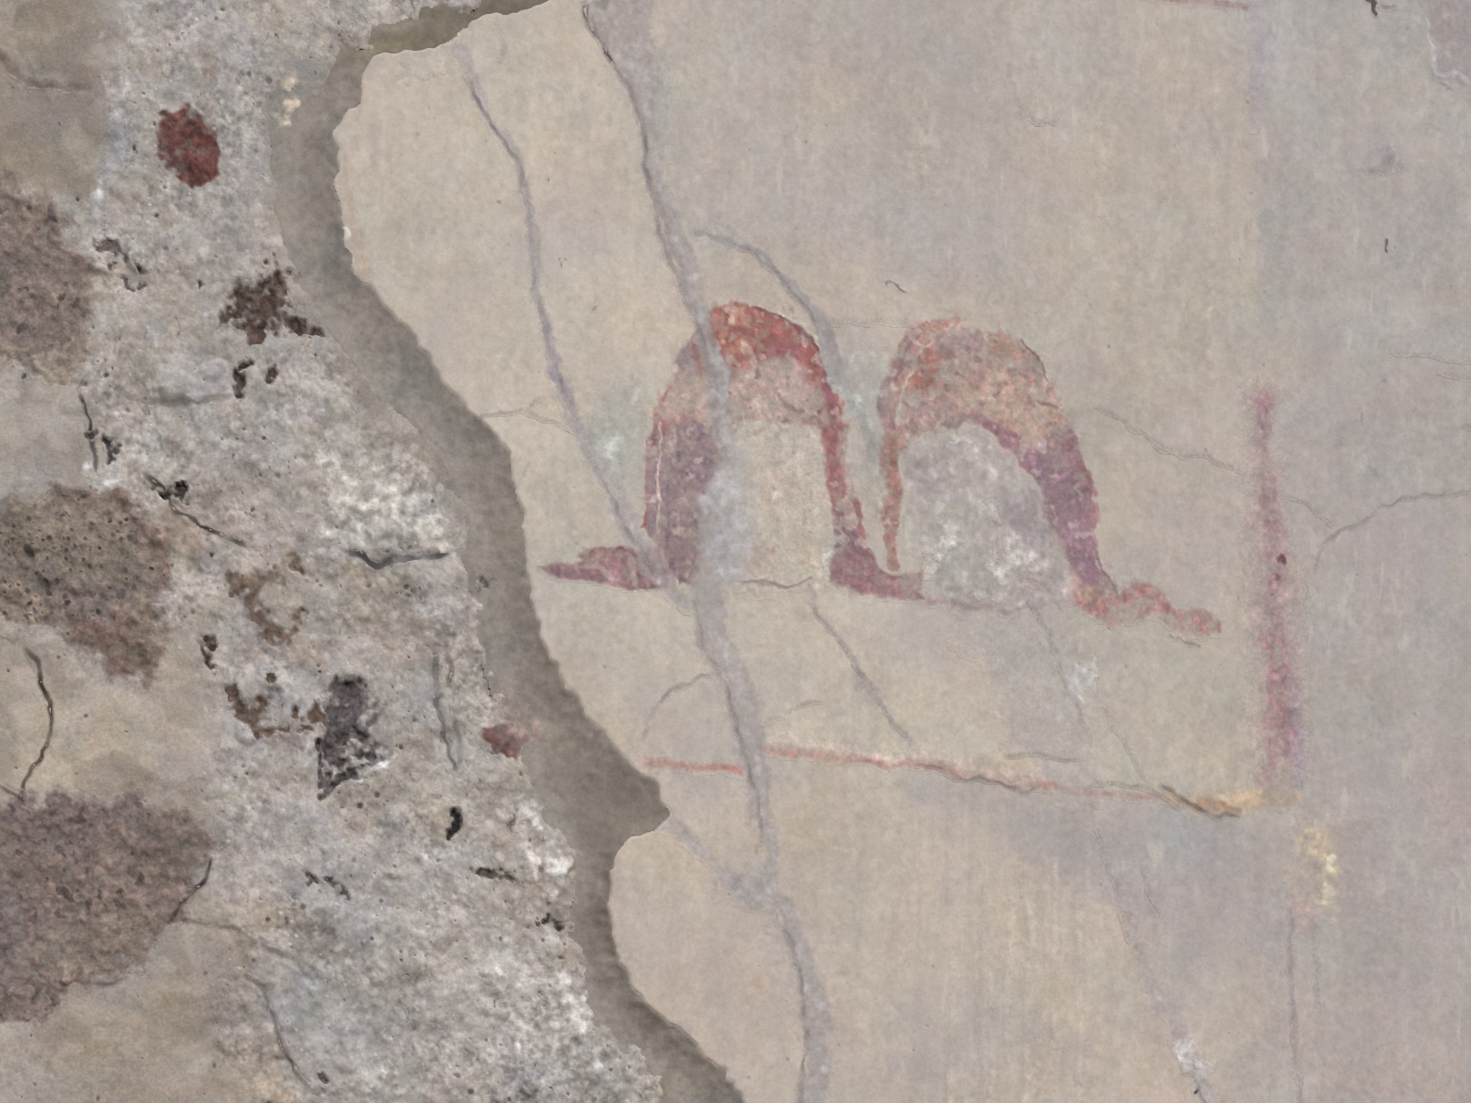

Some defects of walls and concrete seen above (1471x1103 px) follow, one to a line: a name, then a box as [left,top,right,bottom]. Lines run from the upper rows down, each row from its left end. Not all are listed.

hole [90,242,148,294]
hole [215,258,329,386]
spalling [84,427,115,453]
spalling [173,480,189,496]
crack [347,549,455,575]
crack [391,0,1243,1103]
spalling [201,647,243,705]
spalling [264,669,278,686]
spalling [246,672,393,802]
hole [291,869,353,903]
spalling [536,913,565,933]
spalling [316,1071,330,1087]